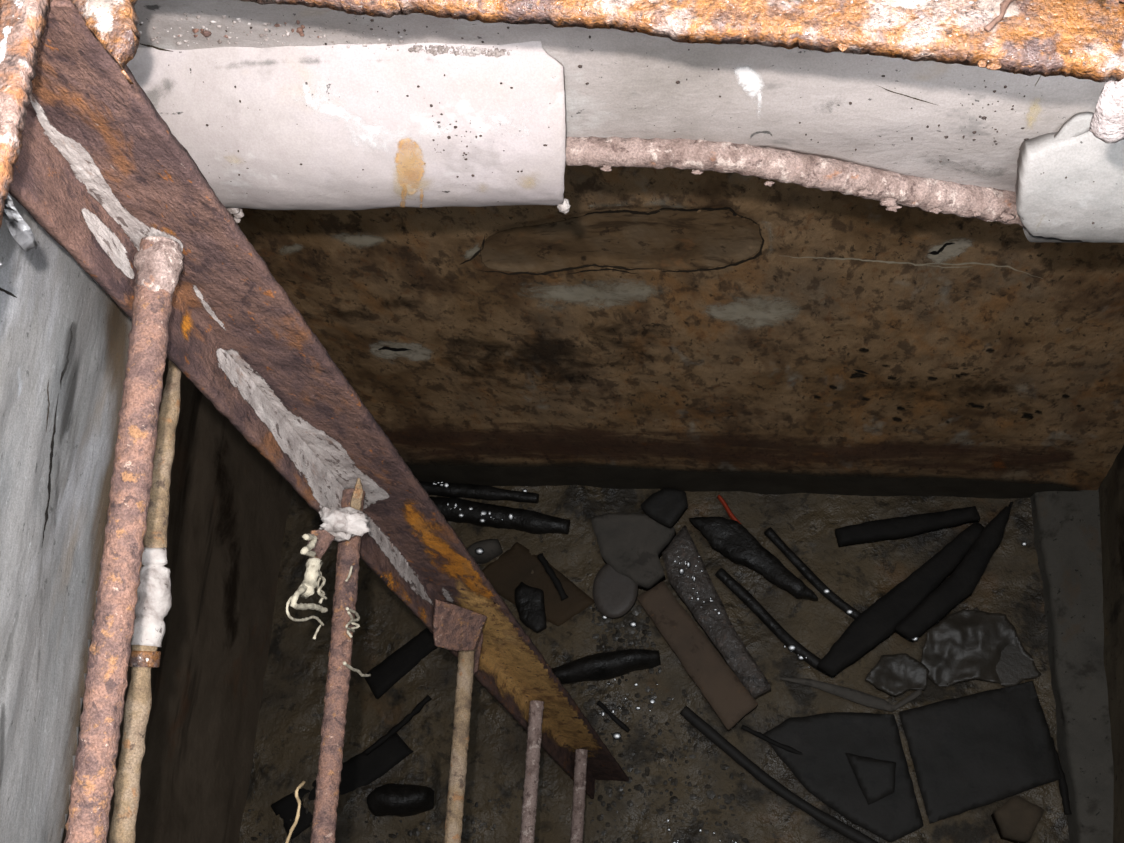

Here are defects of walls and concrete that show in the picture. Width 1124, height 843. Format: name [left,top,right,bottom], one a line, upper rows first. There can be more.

corrosion [396,138,424,208]